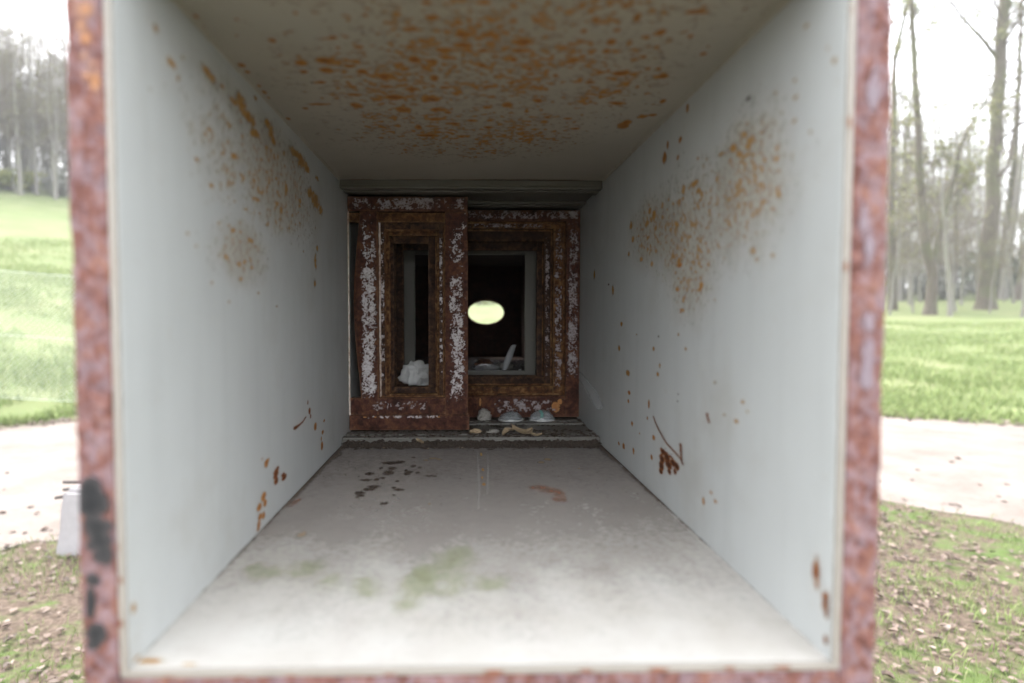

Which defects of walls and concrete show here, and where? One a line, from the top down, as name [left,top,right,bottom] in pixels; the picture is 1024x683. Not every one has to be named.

corrosion [268,0,709,160]
corrosion [191,62,323,281]
corrosion [628,111,793,313]
peeling [352,198,579,419]
damp [79,477,113,650]
corrosion [257,458,286,531]
damp [257,446,686,567]
corrosion [812,559,828,619]